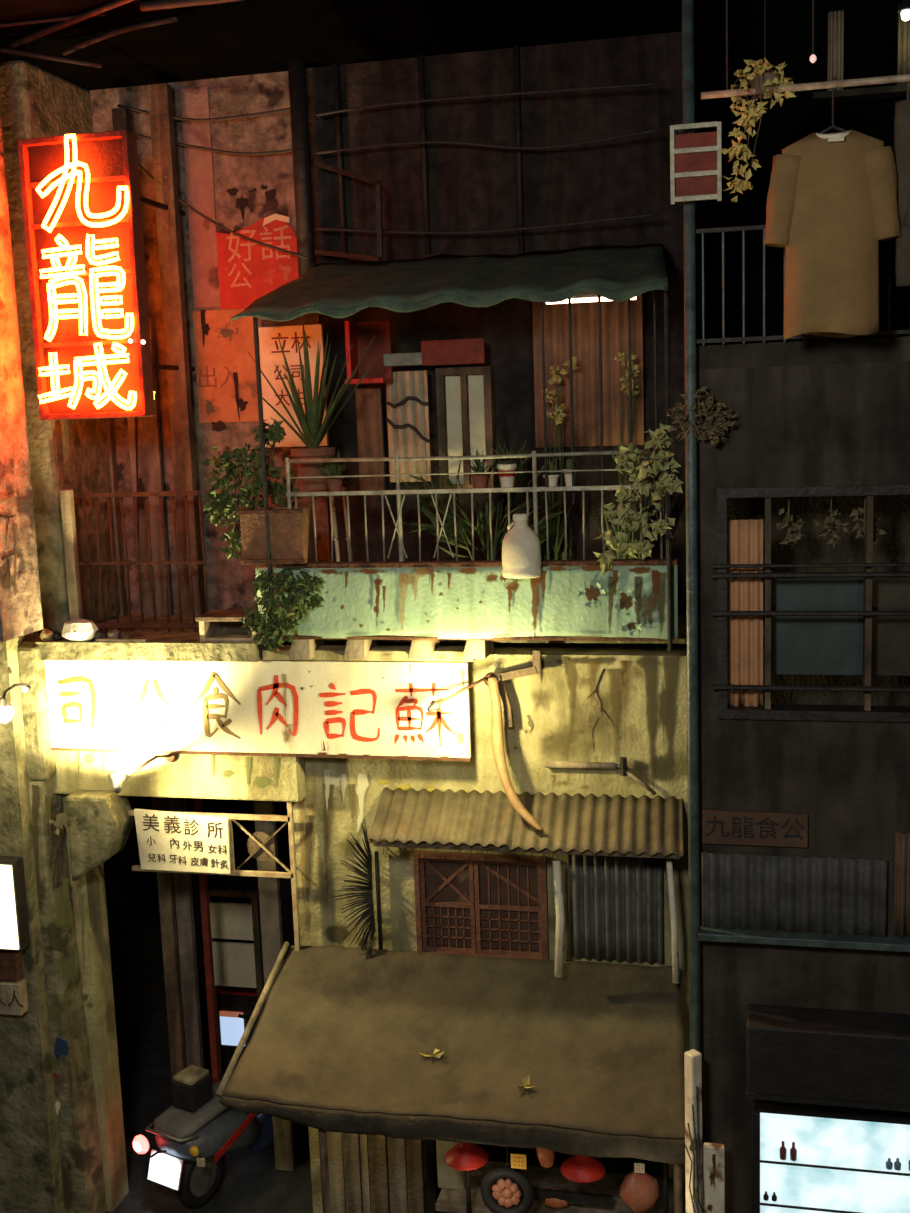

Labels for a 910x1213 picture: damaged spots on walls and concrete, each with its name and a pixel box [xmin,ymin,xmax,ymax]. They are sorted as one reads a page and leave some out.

corrosion [321,565,659,640]
crack [588,669,620,749]